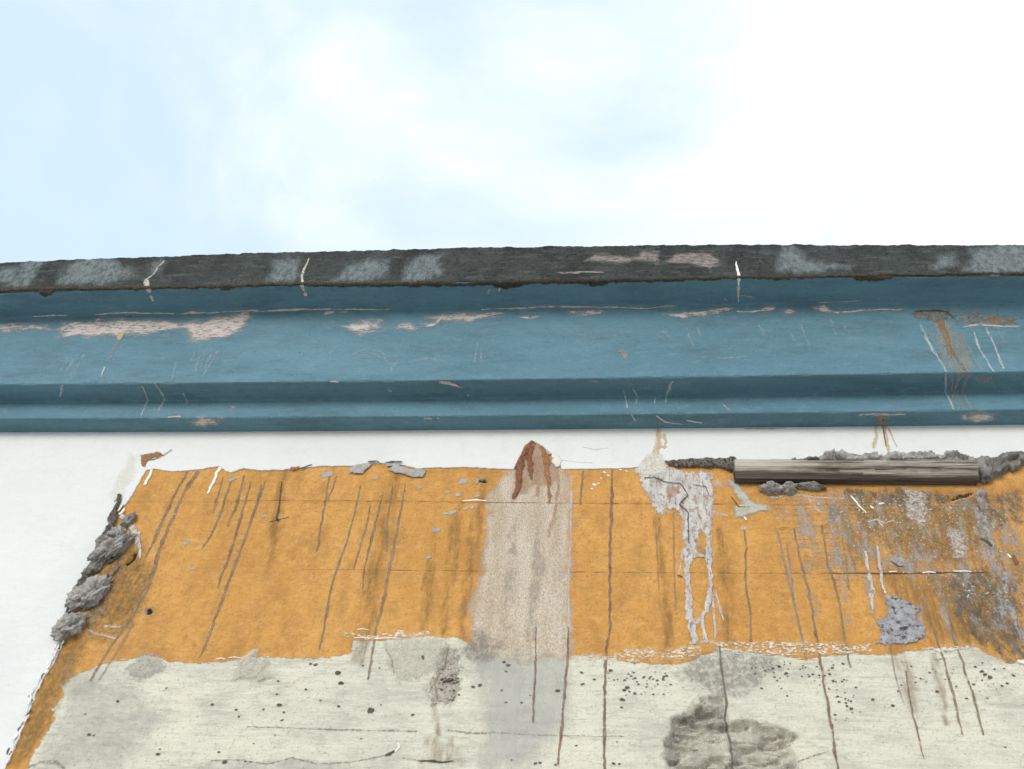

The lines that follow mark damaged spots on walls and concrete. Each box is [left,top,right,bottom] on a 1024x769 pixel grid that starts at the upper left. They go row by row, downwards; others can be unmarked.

peeling [0,308,389,342]
corrosion [912,308,1017,422]
spalling [103,494,126,534]
spalling [349,460,425,489]
corrosion [512,440,562,537]
damp [636,457,768,644]
damp [466,448,584,765]
peeling [5,640,64,764]
spalling [425,649,482,705]
spalling [574,646,701,708]
spalling [664,697,825,769]
spalling [716,594,972,721]